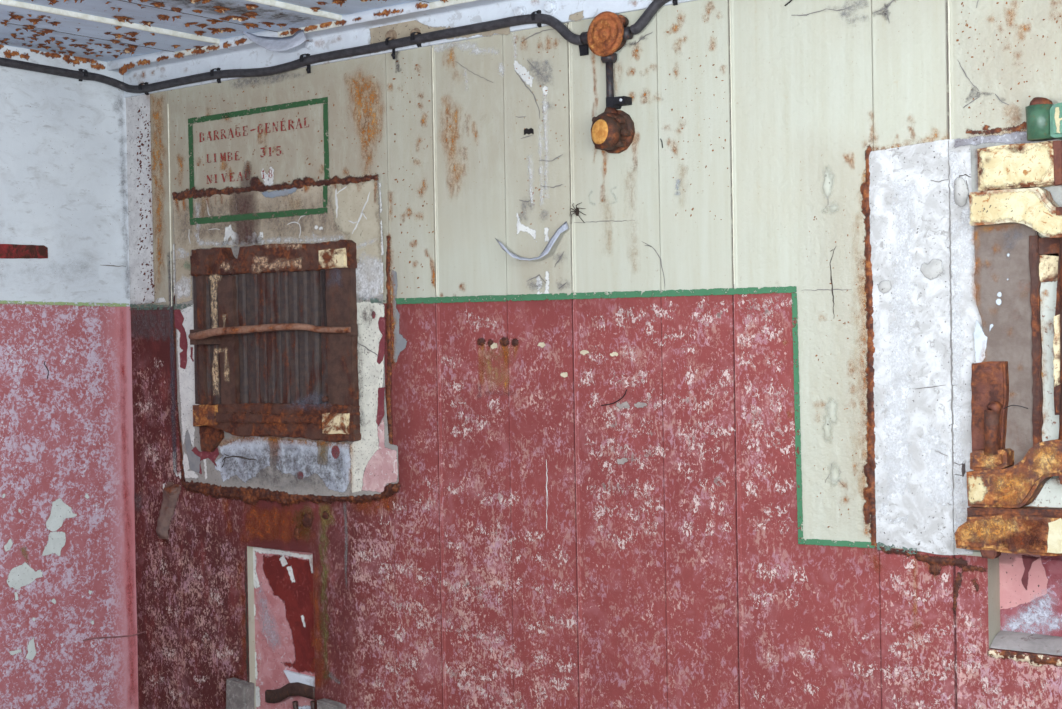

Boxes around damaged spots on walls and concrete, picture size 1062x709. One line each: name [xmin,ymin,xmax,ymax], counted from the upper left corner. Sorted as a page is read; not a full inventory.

rust [0,0,428,77]
rust [153,100,207,274]
rust [336,58,443,303]
peeling [154,166,407,493]
rust [477,337,518,389]
peeling [951,207,973,379]
peeling [952,431,966,540]
rust [1037,449,1057,472]
peeling [7,562,43,601]
peeling [42,498,77,556]
peeling [253,547,313,588]
rust [963,520,1045,549]